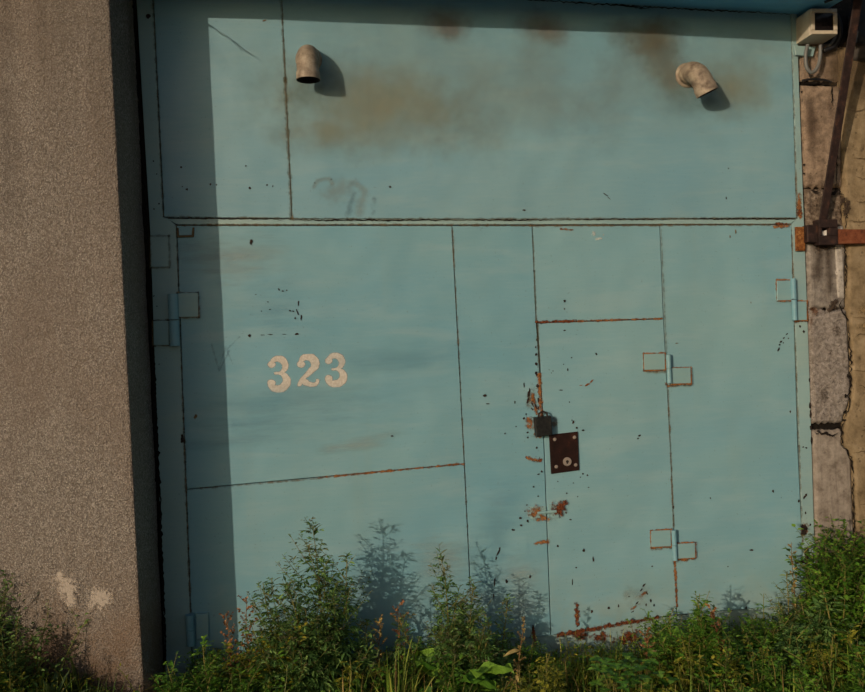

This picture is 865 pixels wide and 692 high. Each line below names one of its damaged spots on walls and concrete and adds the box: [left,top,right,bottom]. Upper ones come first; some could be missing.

crack [811,156,865,537]
corrosion [526,393,541,438]
corrosion [527,500,568,521]
corrosion [593,629,642,647]